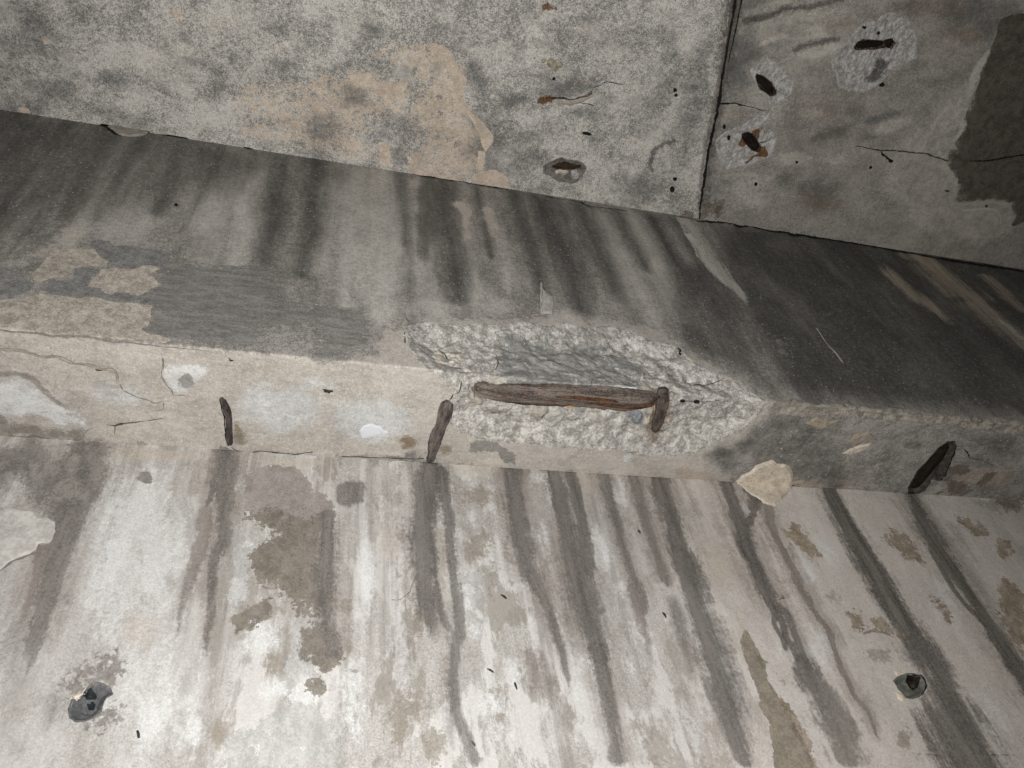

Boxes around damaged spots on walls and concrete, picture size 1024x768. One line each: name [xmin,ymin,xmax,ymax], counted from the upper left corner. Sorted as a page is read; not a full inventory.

peeling [347,72,408,100]
peeling [407,45,509,189]
hole [715,58,794,169]
hole [831,12,918,93]
crack [857,146,948,163]
water stain [890,13,1024,235]
crack [0,329,219,397]
spalling [402,289,1024,459]
water stain [181,449,364,768]
water stain [628,475,814,768]
water stain [716,481,877,764]
water stain [818,488,1001,768]